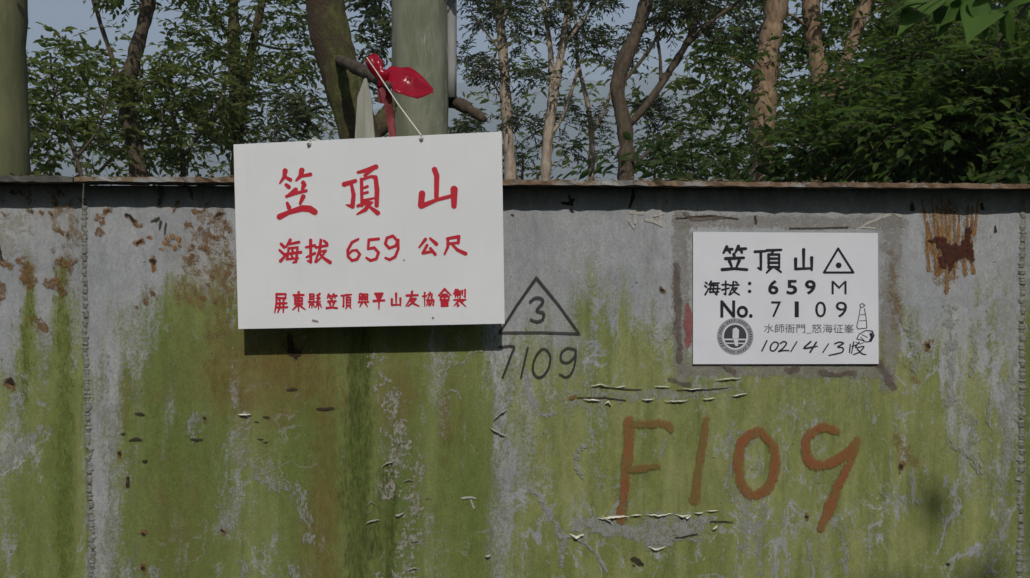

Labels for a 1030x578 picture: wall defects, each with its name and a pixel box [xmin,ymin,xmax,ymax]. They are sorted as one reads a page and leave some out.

corrosion [910,195,985,294]
corrosion [0,185,237,578]
peeling [556,378,748,412]
peeling [527,485,733,573]